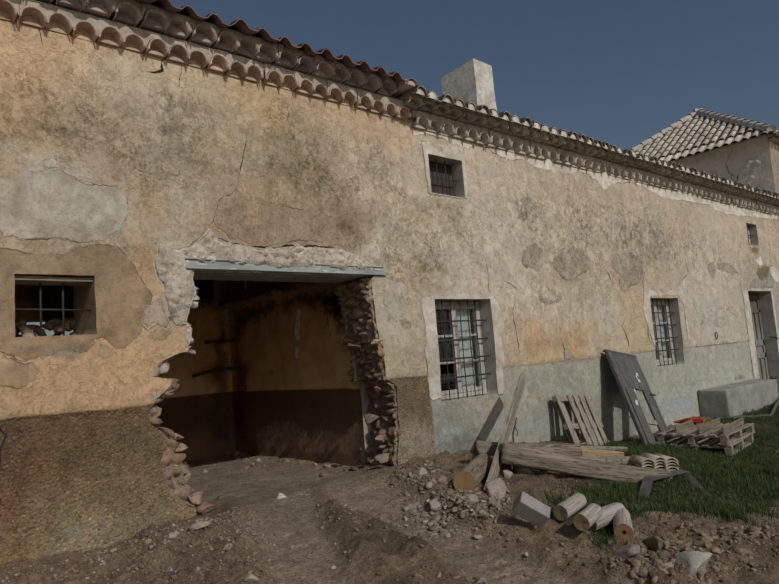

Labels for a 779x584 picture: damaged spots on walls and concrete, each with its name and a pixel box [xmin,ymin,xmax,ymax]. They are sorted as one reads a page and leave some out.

crack [172,111,334,249]
peeling [410,119,778,220]
peeling [0,153,374,360]
peeling [522,243,590,280]
peeling [756,256,779,282]
spalling [173,433,188,453]